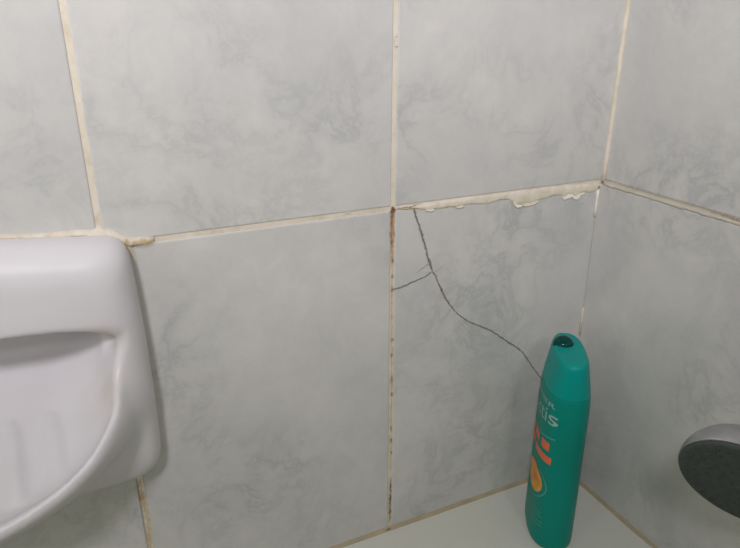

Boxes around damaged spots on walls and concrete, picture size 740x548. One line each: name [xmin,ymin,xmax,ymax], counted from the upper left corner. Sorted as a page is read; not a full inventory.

crack [394,208,541,378]